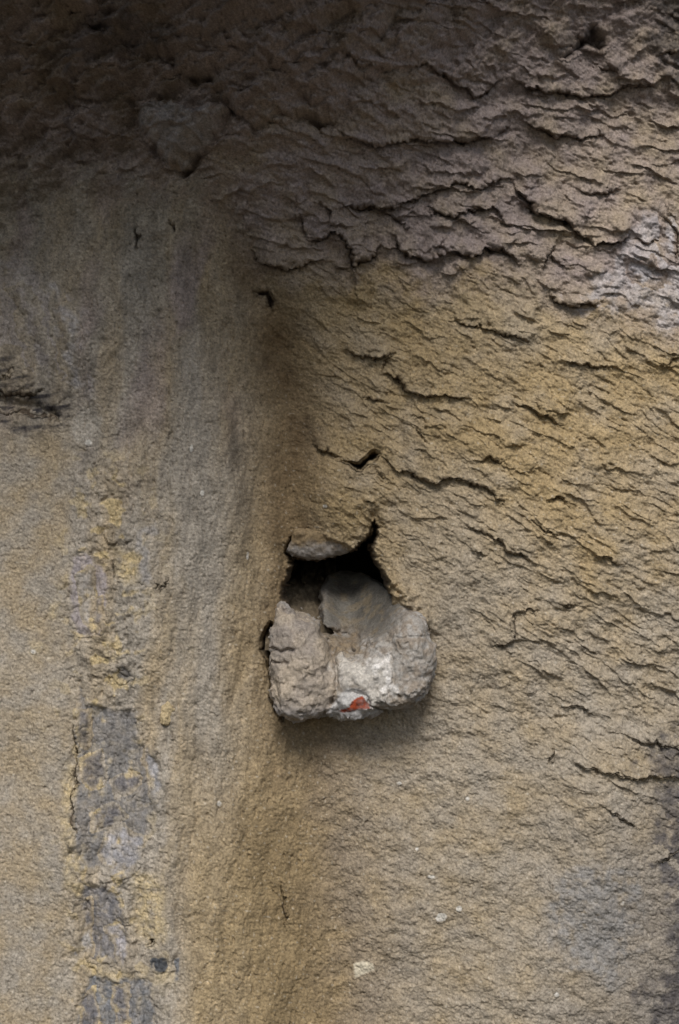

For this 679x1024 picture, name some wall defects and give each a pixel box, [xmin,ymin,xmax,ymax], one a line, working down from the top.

crack [549,293,597,308]
crack [494,331,530,344]
crack [571,361,617,369]
crack [343,350,436,443]
crack [513,398,557,425]
crack [311,442,343,461]
crack [375,456,506,505]
crack [464,525,530,562]
spalling [230,214,679,1024]
crack [496,603,580,648]
crack [634,739,670,748]
crack [549,750,679,781]